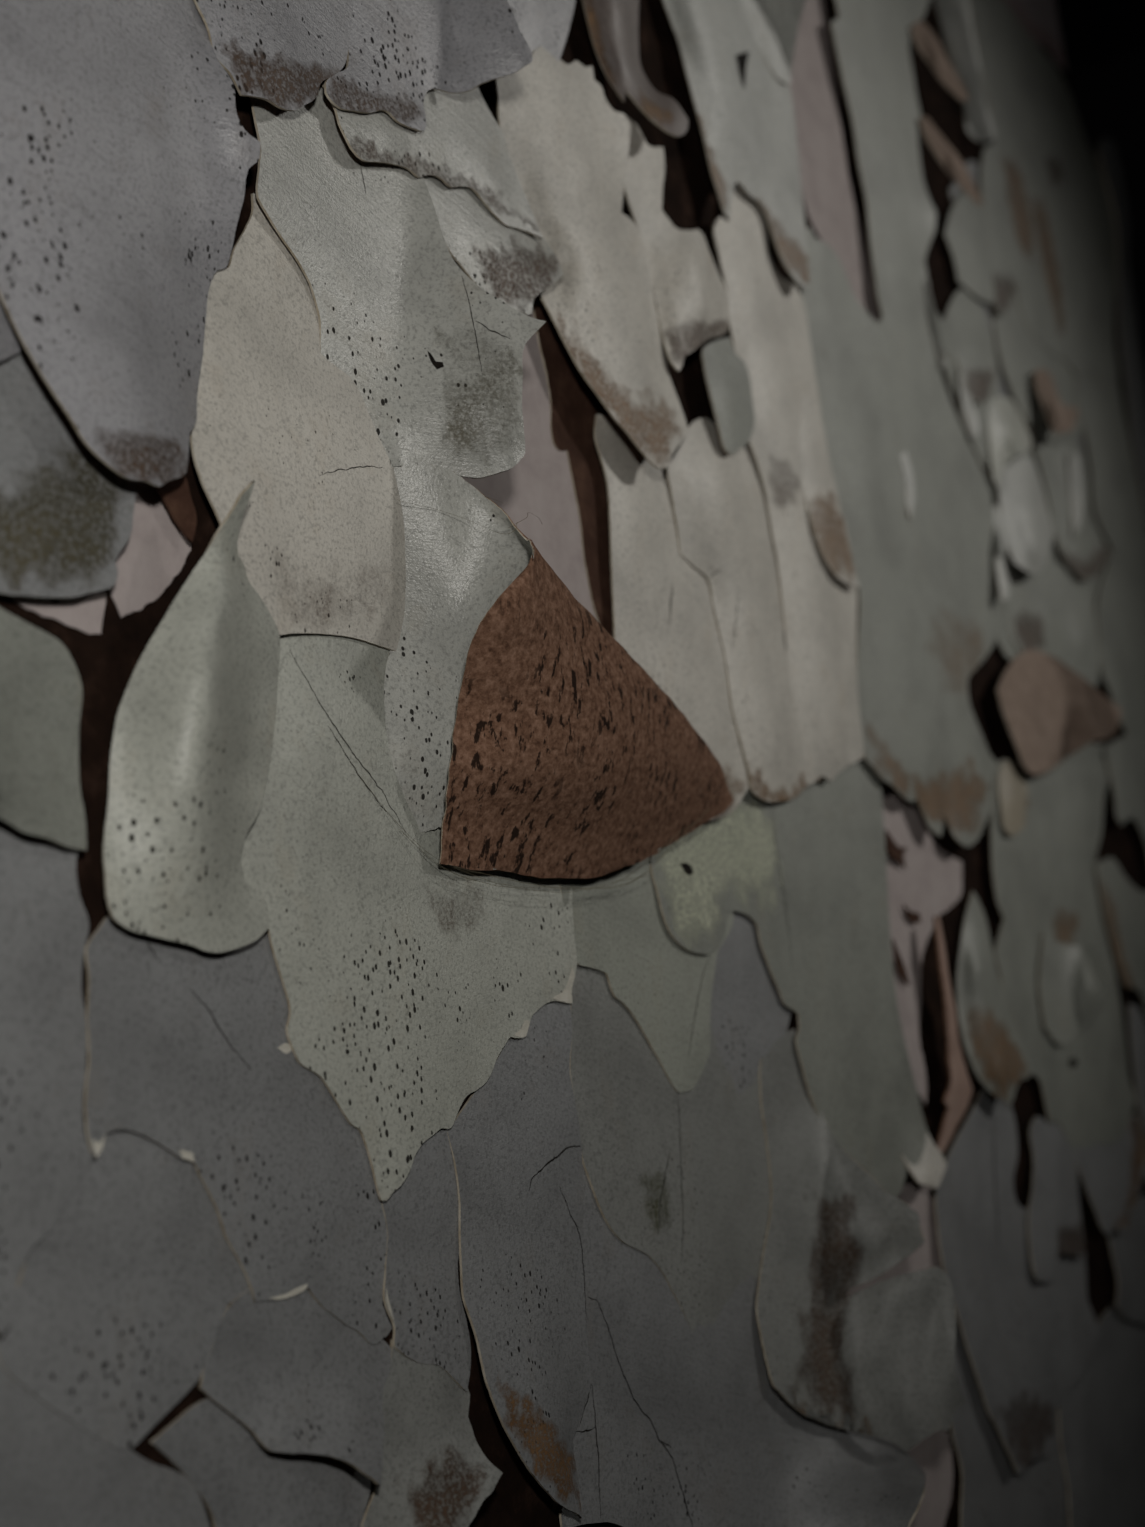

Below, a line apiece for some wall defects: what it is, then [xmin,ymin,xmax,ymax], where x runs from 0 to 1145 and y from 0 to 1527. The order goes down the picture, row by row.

peeling [0,608,953,1527]
crack [529,1145,693,1527]
peeling [495,0,1145,1527]